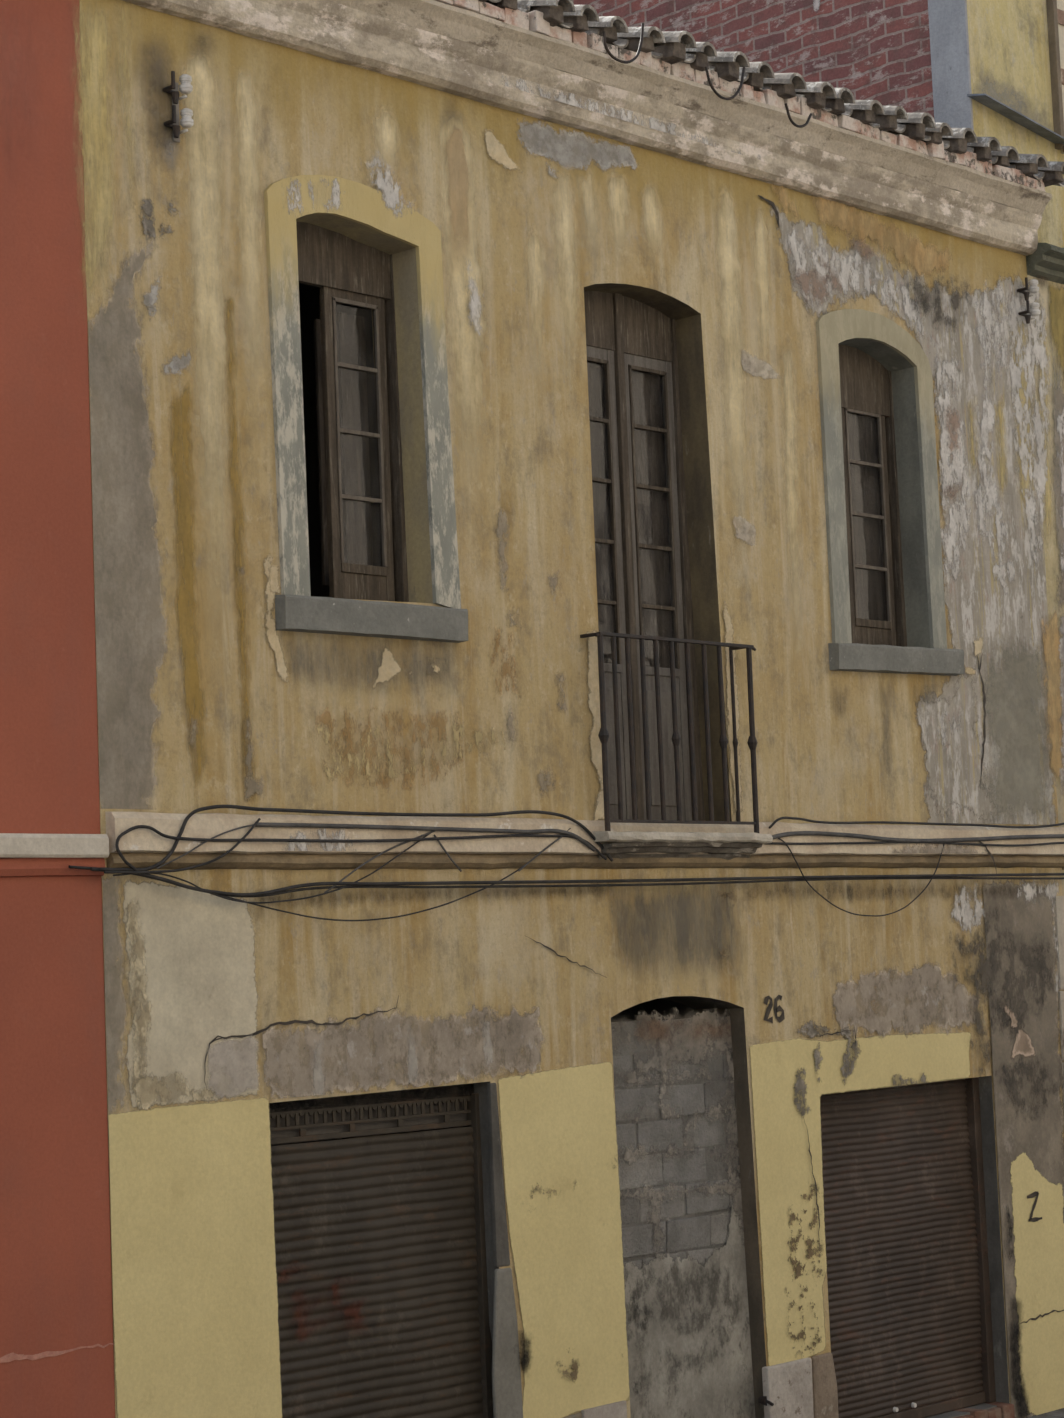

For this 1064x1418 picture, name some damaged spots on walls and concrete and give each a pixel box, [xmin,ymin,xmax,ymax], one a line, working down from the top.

flaking render [485,121,637,178]
flaking render [88,199,177,809]
flaking render [771,207,1064,825]
spalling [894,844,975,853]
flaking render [102,878,543,1112]
leakage [942,879,1060,1113]
spalling [794,881,1064,1418]
crack [0,1343,115,1363]
peeling [785,1185,823,1353]